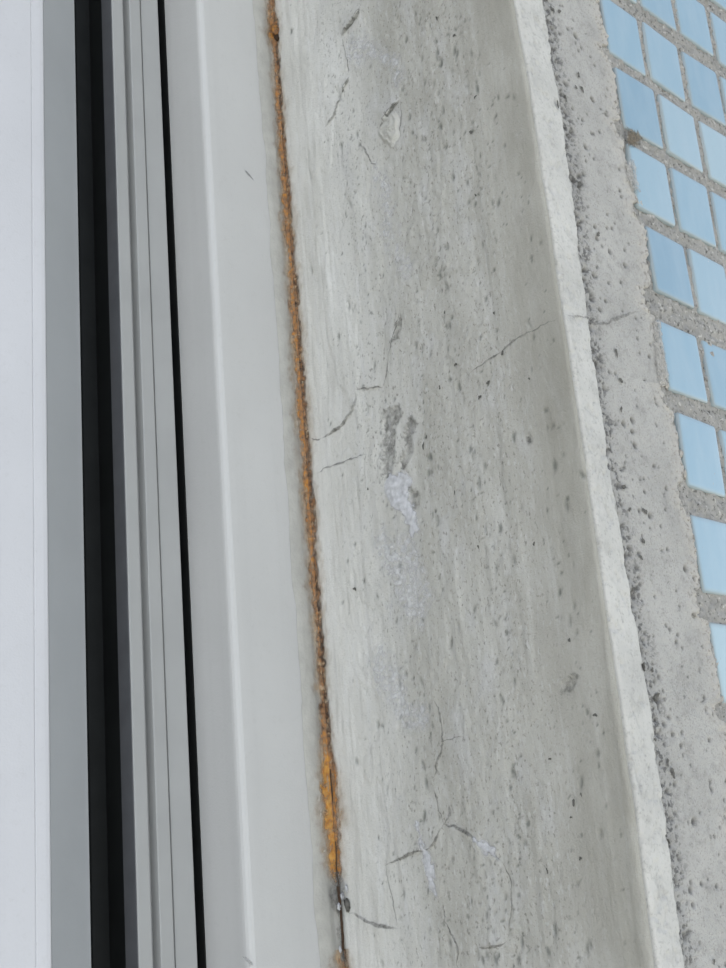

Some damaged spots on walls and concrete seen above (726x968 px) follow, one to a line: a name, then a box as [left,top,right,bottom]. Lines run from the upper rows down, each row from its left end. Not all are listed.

corrosion [267,0,343,886]
crack [391,794,469,863]
corrosion [335,949,348,968]